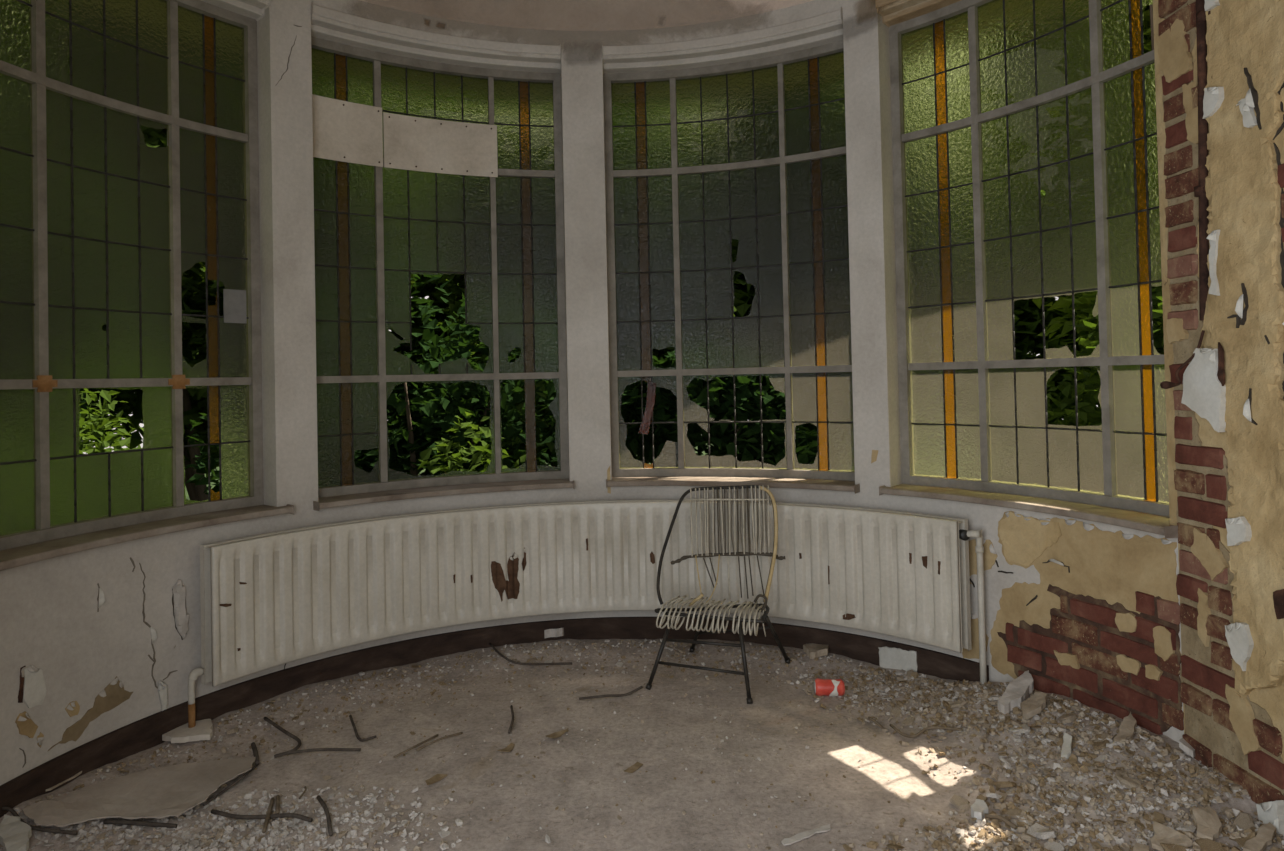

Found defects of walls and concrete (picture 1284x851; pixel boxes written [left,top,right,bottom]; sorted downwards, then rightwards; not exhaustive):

flaking render [962,0,1284,836]
corrosion [491,552,520,602]
peeling [15,665,133,751]